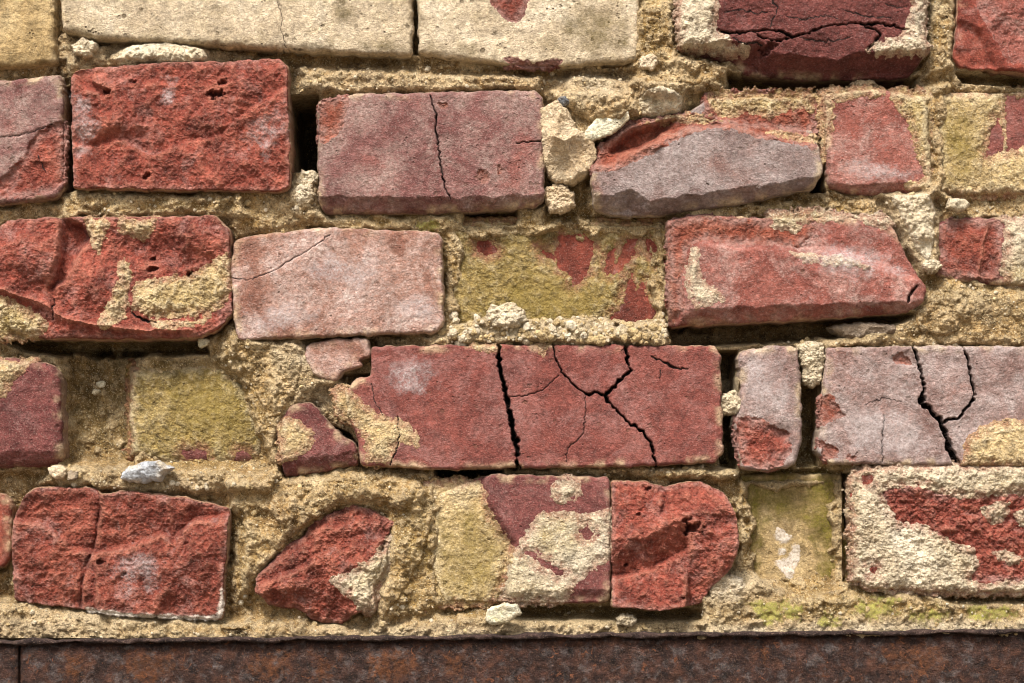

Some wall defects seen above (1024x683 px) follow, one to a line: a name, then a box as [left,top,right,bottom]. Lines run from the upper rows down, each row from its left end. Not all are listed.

crack [720,0,907,50]
crack [430,96,451,199]
peeling [584,83,1024,289]
crack [496,345,688,470]
crack [866,347,974,462]
spalling [254,504,394,624]
spalling [423,473,739,625]